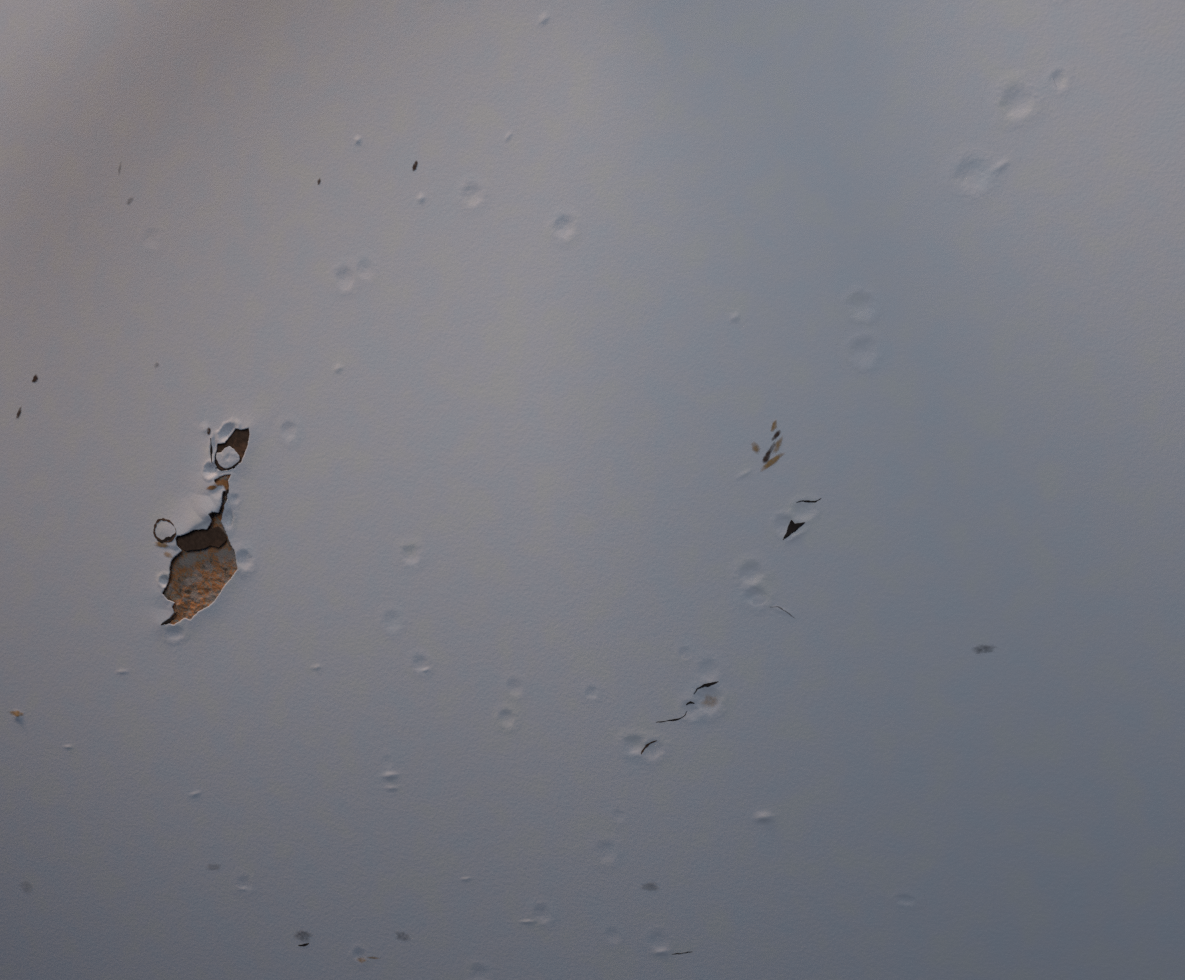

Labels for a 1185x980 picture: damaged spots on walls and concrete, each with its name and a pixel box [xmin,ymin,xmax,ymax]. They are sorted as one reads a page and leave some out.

peeling [129,386,284,664]
peeling [754,421,781,468]